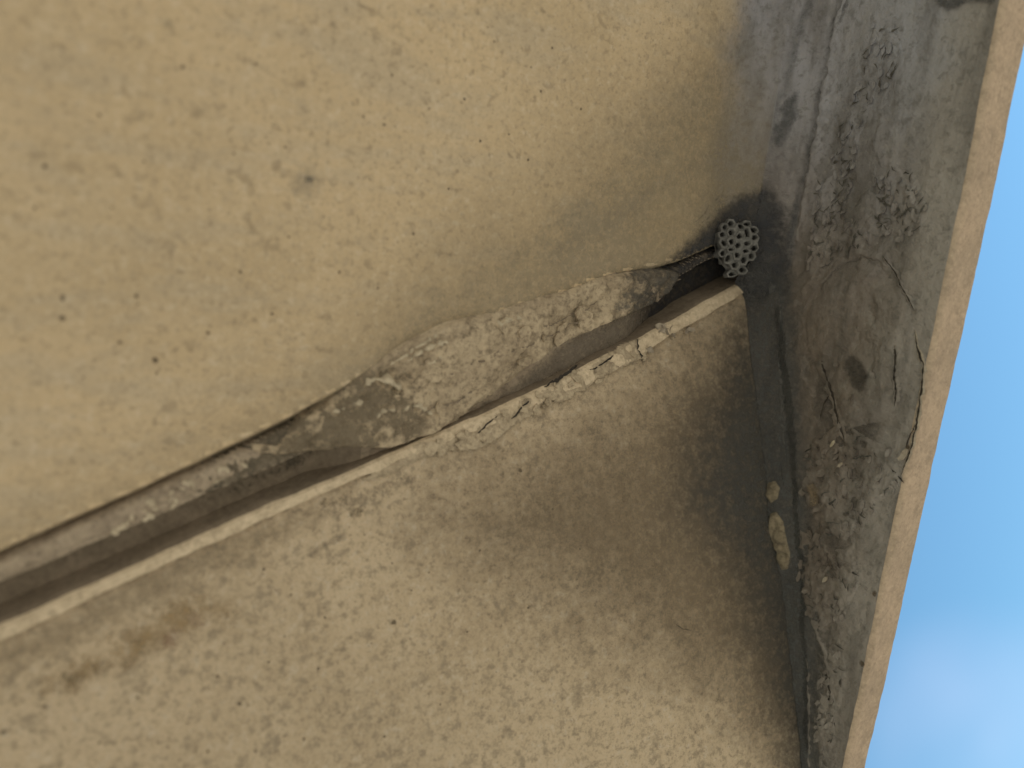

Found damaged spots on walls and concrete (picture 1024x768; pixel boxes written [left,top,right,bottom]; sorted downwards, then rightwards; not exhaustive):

flaking render [805,165,927,277]
spalling [0,268,681,577]
crack [817,354,847,442]
crack [883,255,927,476]
flaking render [765,420,910,768]